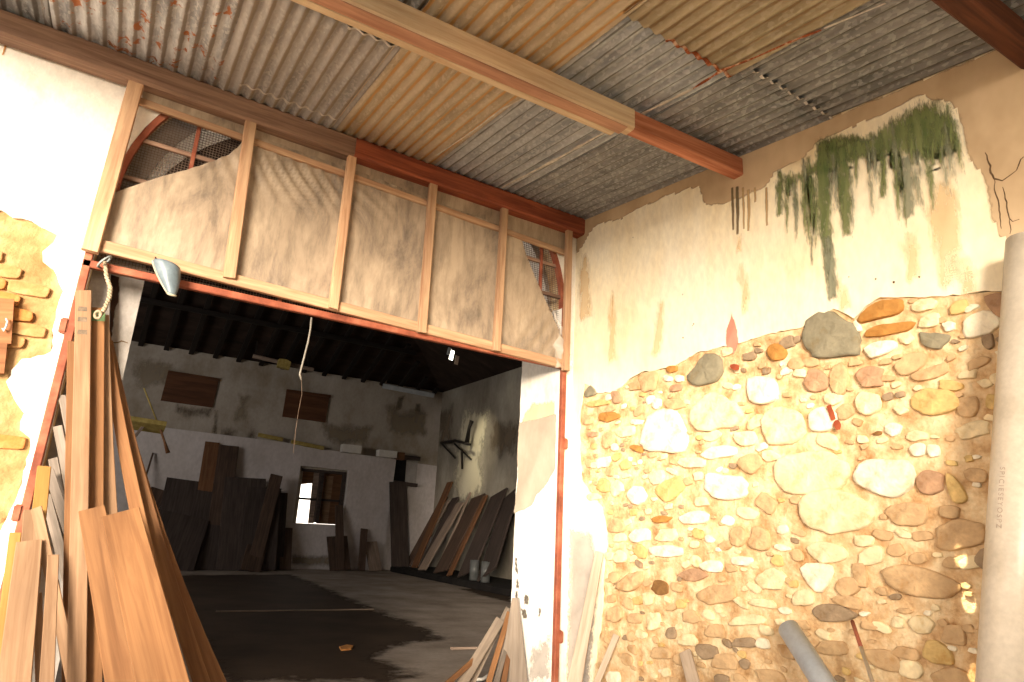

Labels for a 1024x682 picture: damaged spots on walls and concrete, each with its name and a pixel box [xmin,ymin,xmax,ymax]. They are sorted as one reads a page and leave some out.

corrosion [641,3,886,119]
corrosion [501,133,605,188]
water stain [731,186,768,234]
peeling [576,50,1024,252]
crack [985,152,1024,233]
spalling [0,211,63,531]
peeling [514,414,556,513]
spalling [580,292,1002,682]